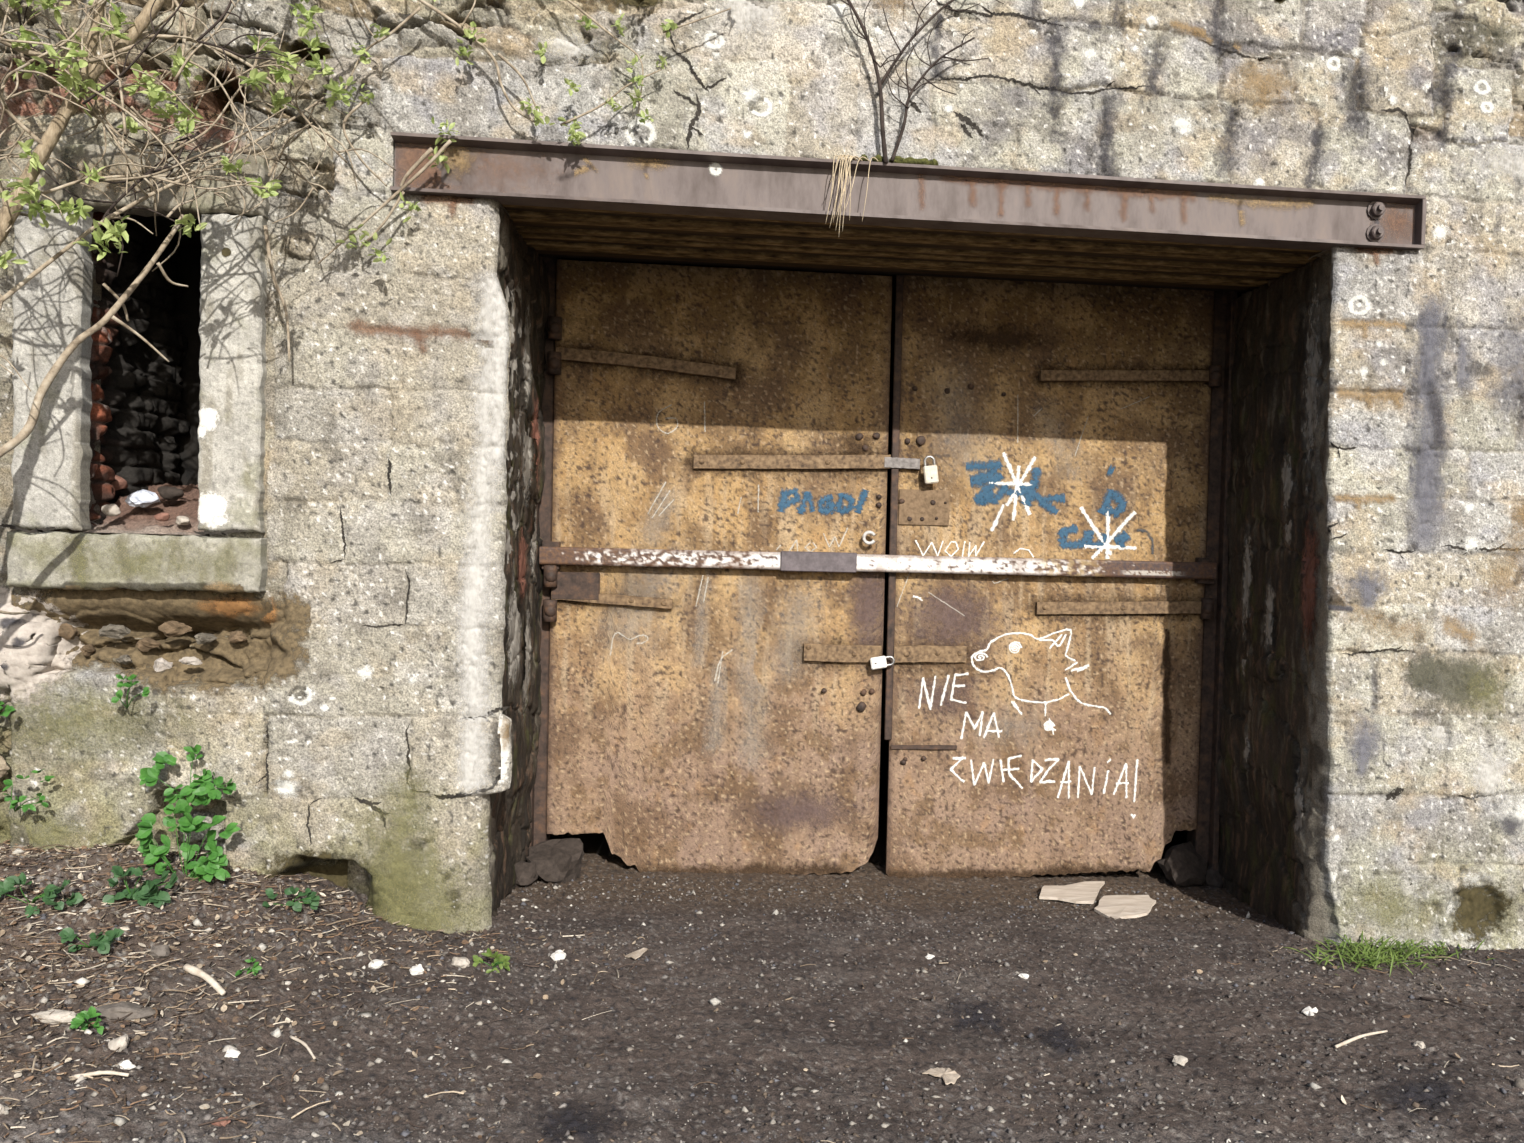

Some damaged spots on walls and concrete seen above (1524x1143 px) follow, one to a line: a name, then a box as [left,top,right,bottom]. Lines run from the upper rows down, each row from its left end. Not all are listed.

crack [930,74,1151,95]
rust [399,146,473,214]
rust [709,163,722,176]
rust [1356,247,1393,264]
water stain [1413,299,1470,542]
rust [684,432,888,477]
spalling [11,583,312,695]
rust [908,587,999,646]
rust [894,662,971,712]
rust [1032,595,1201,764]
spalling [262,849,348,888]
spalling [1447,874,1513,945]